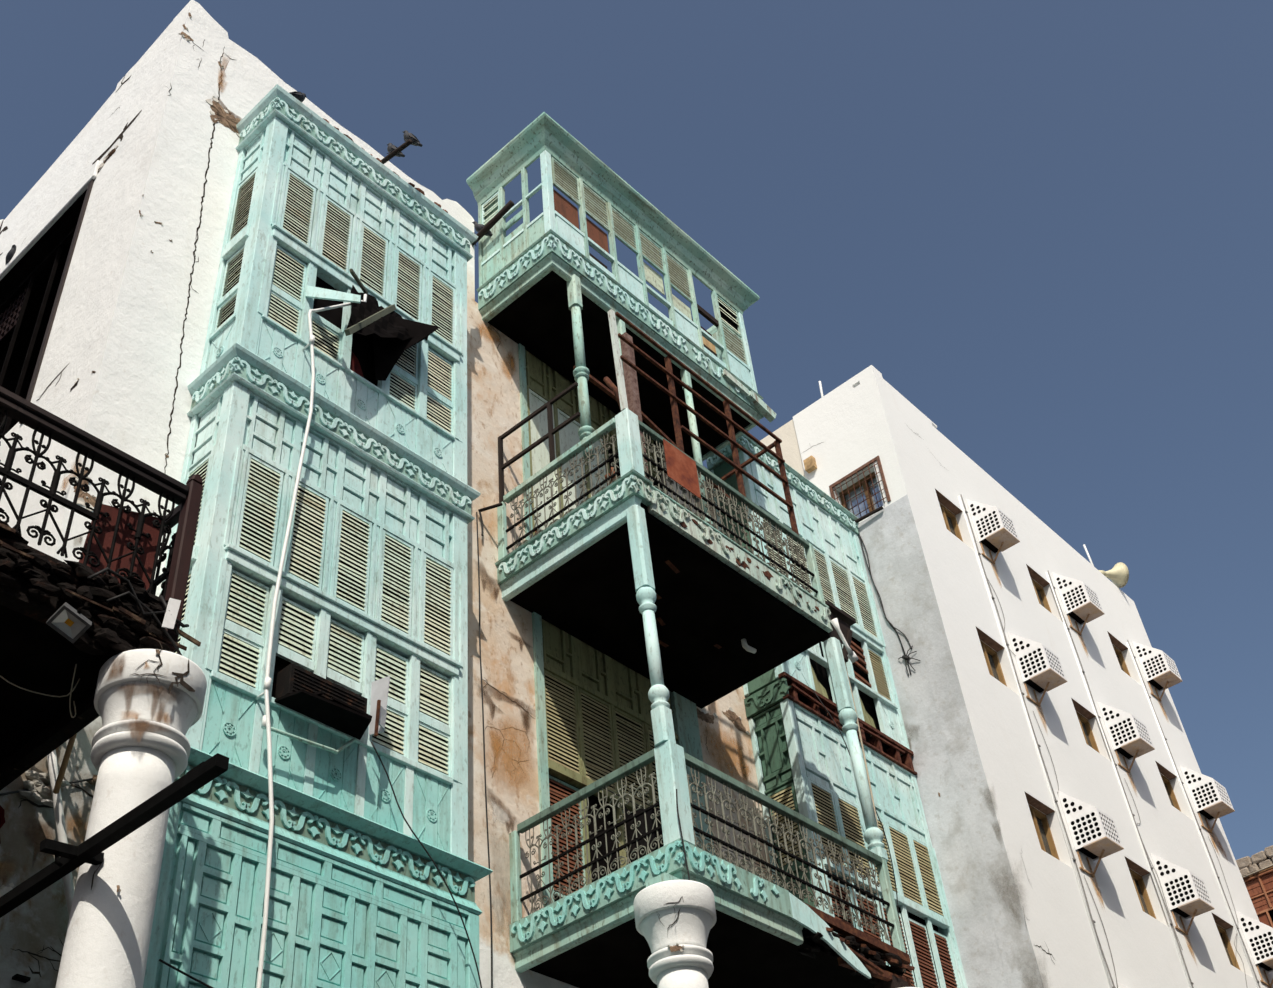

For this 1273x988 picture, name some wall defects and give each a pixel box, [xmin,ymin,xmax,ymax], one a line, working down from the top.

crack [92,74,142,165]
spalling [206,96,241,137]
crack [164,40,235,472]
peeling [73,470,96,511]
crack [131,639,195,694]
peeling [0,883,14,897]
crack [658,897,684,937]